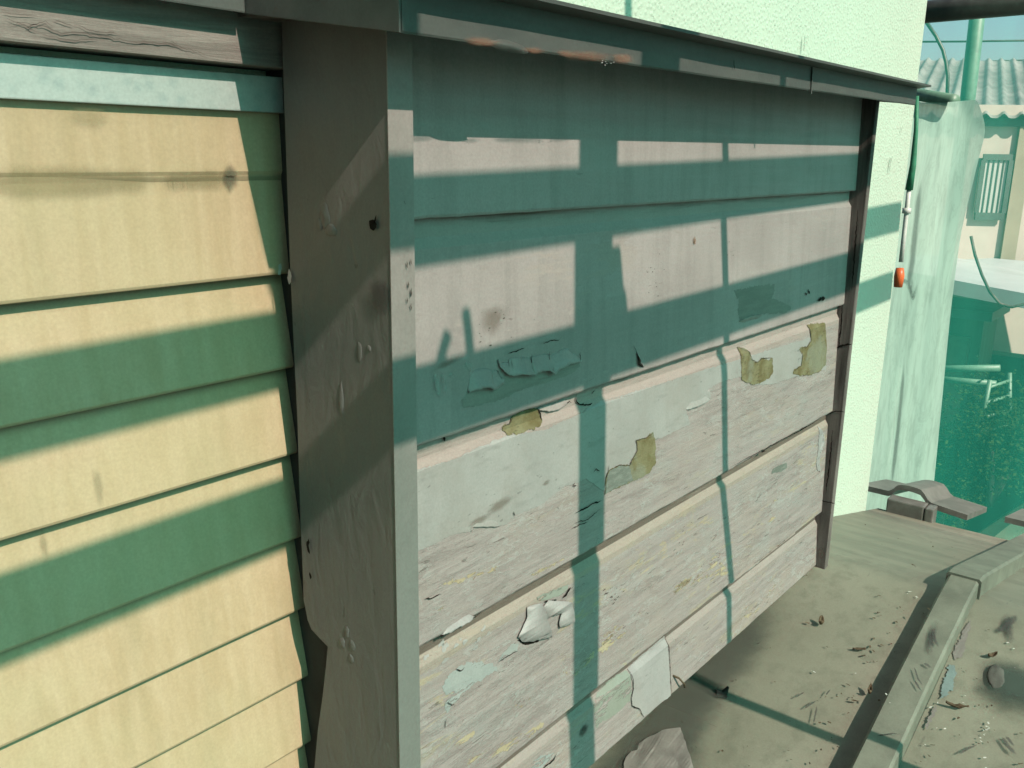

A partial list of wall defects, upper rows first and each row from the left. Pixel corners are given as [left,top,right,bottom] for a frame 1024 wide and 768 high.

crack [3,12,206,55]
peeling [417,322,827,550]
peeling [423,584,575,726]
peeling [593,636,672,728]